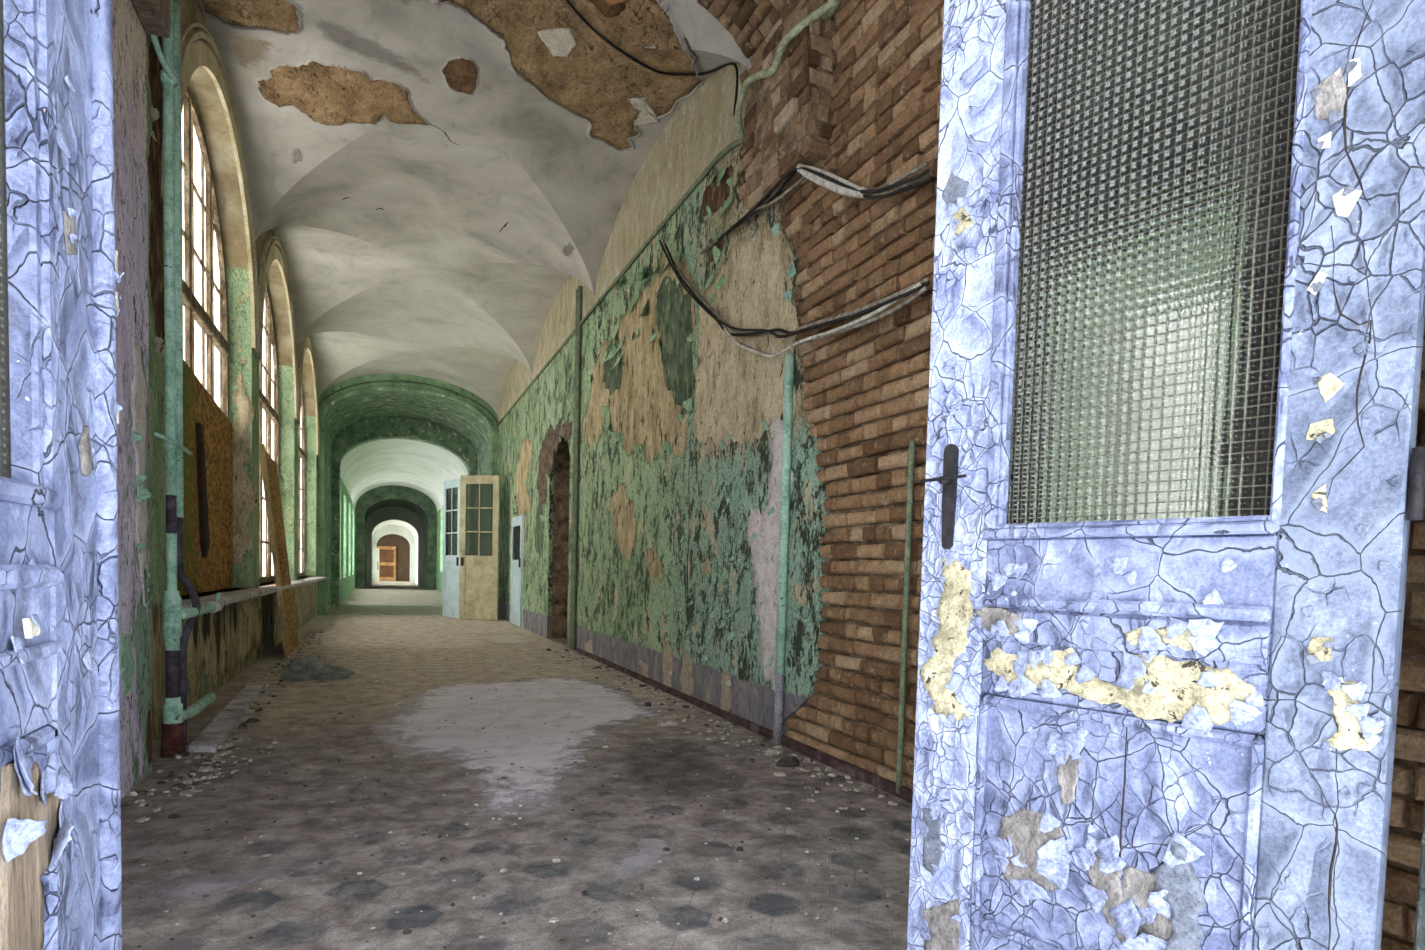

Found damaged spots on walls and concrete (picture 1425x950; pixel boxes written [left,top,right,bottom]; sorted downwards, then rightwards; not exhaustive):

flaking render [198,0,304,36]
flaking render [255,58,433,127]
flaking render [431,0,707,152]
crack [1343,0,1374,206]
flaking render [514,0,992,790]
crack [1326,225,1372,500]
flaking render [1416,322,1425,444]
peeling [973,562,1097,698]
flaking render [1306,512,1425,950]
peeling [0,733,77,950]
peeling [986,725,1206,950]
crack [1322,791,1338,950]